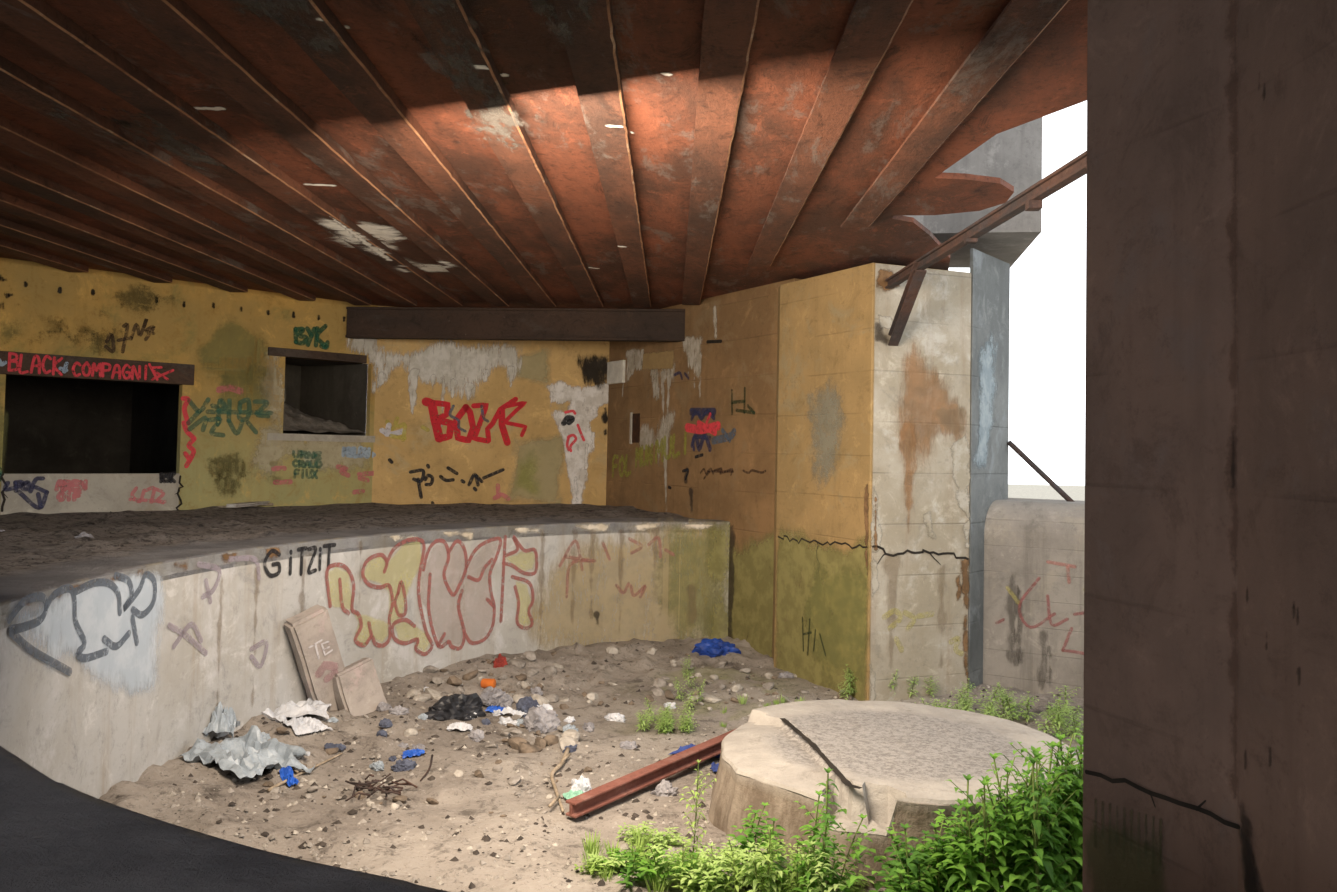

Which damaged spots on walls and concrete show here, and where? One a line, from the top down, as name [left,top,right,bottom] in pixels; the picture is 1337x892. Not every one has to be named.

rust [899,352,965,509]
crack [778,535,969,572]
crack [1085,770,1240,830]